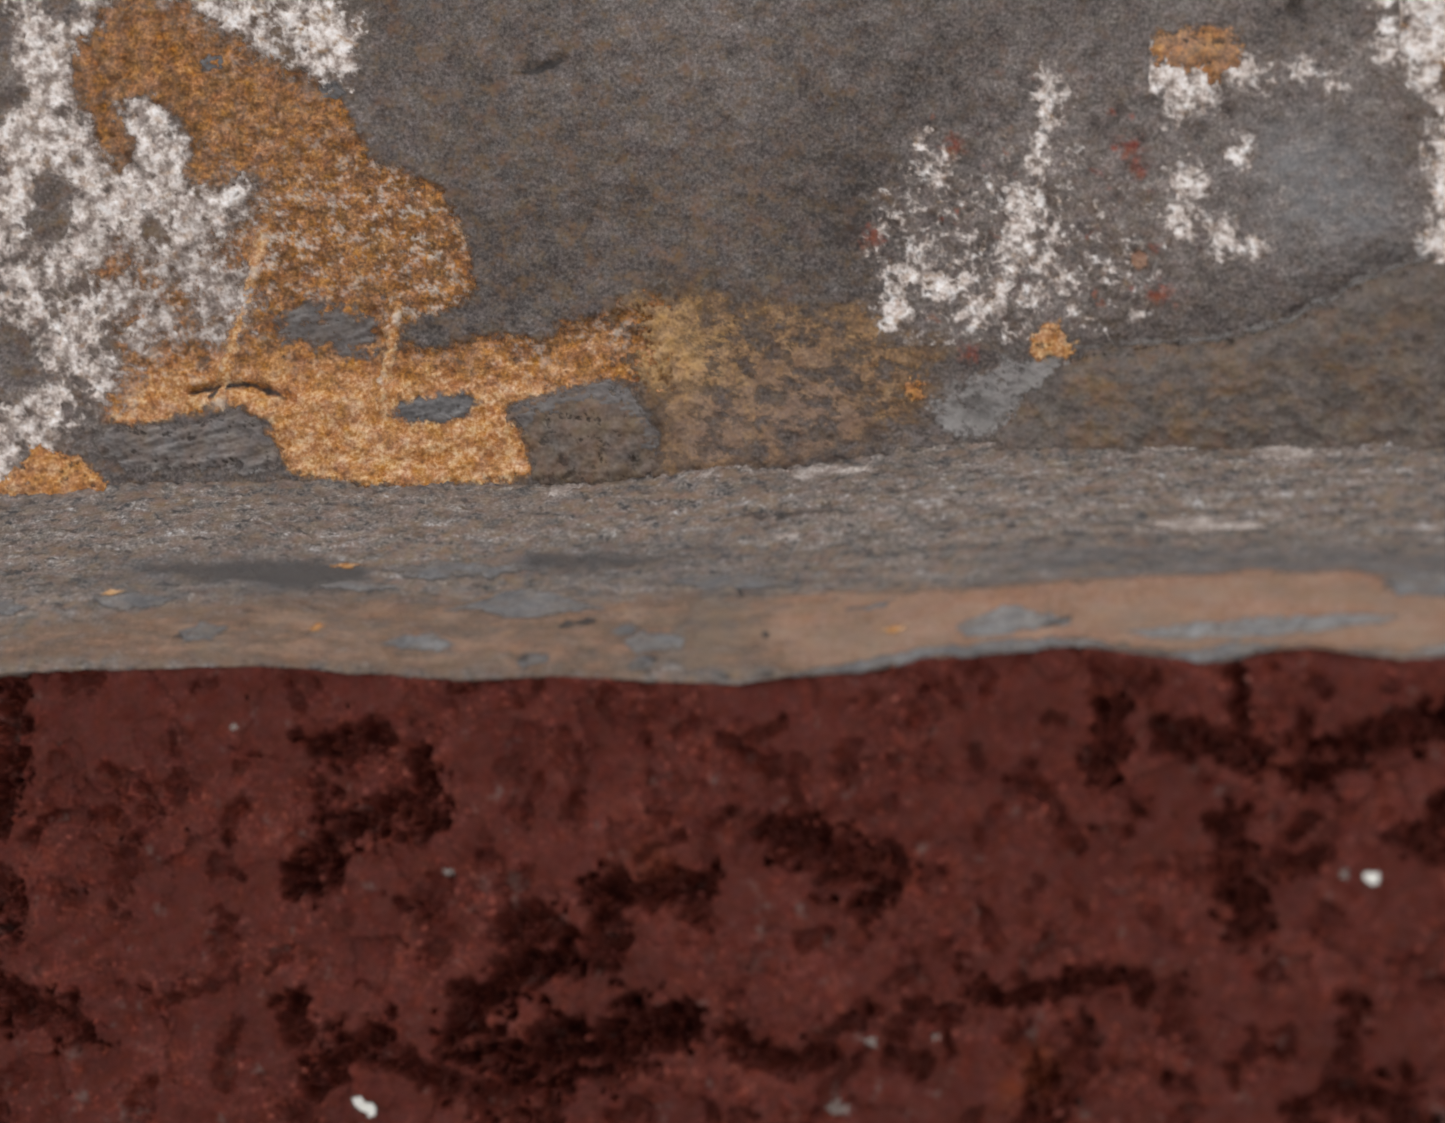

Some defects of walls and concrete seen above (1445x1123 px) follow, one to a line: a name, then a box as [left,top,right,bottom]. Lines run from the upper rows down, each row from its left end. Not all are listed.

water stain [168,0,368,93]
peeling [1150,25,1245,88]
water stain [1149,43,1351,173]
water stain [1366,0,1445,264]
water stain [0,0,269,484]
peeling [0,0,676,496]
water stain [635,61,1164,471]
water stain [1119,152,1274,265]
peeling [905,375,927,401]